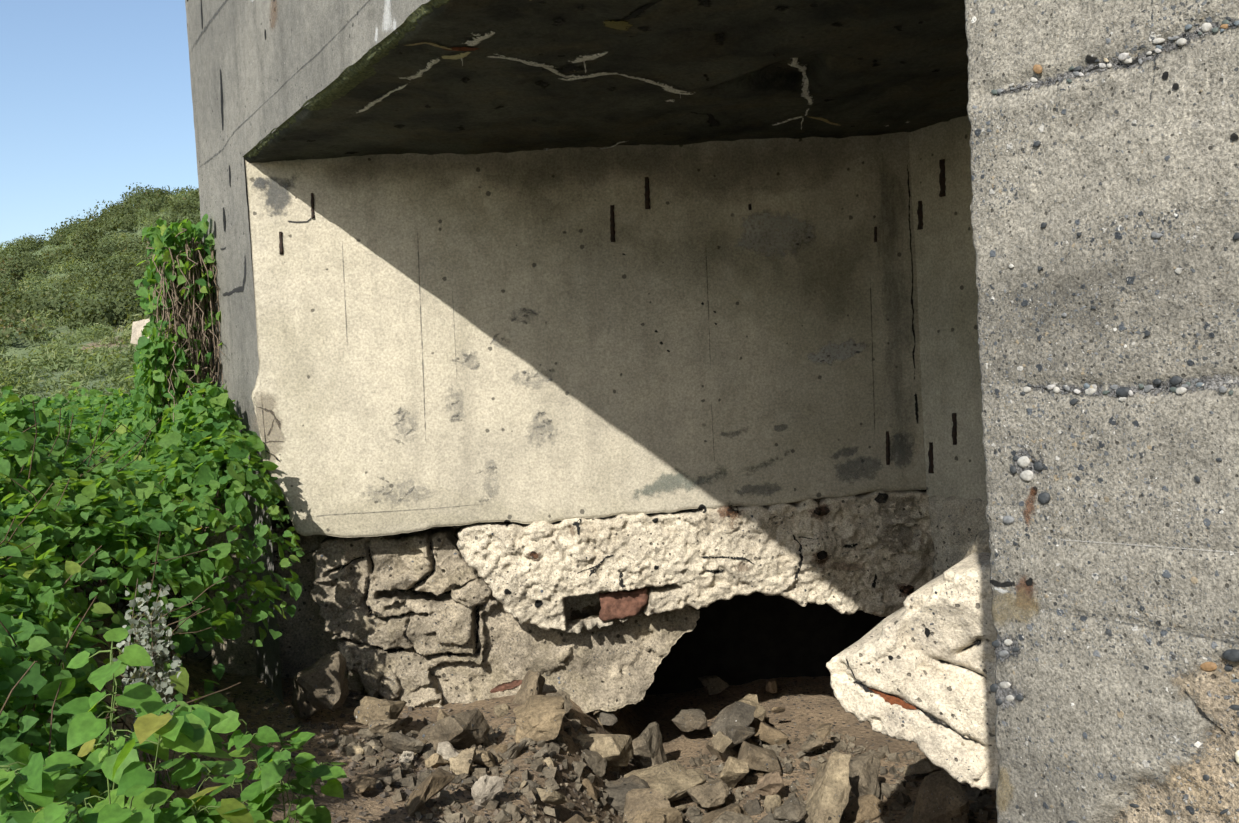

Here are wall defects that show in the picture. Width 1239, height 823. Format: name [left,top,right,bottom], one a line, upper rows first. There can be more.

crack [356,0,719,127]
crack [774,58,840,129]
damp [254,177,291,214]
damp [637,470,726,495]
rust [1016,577,1037,609]